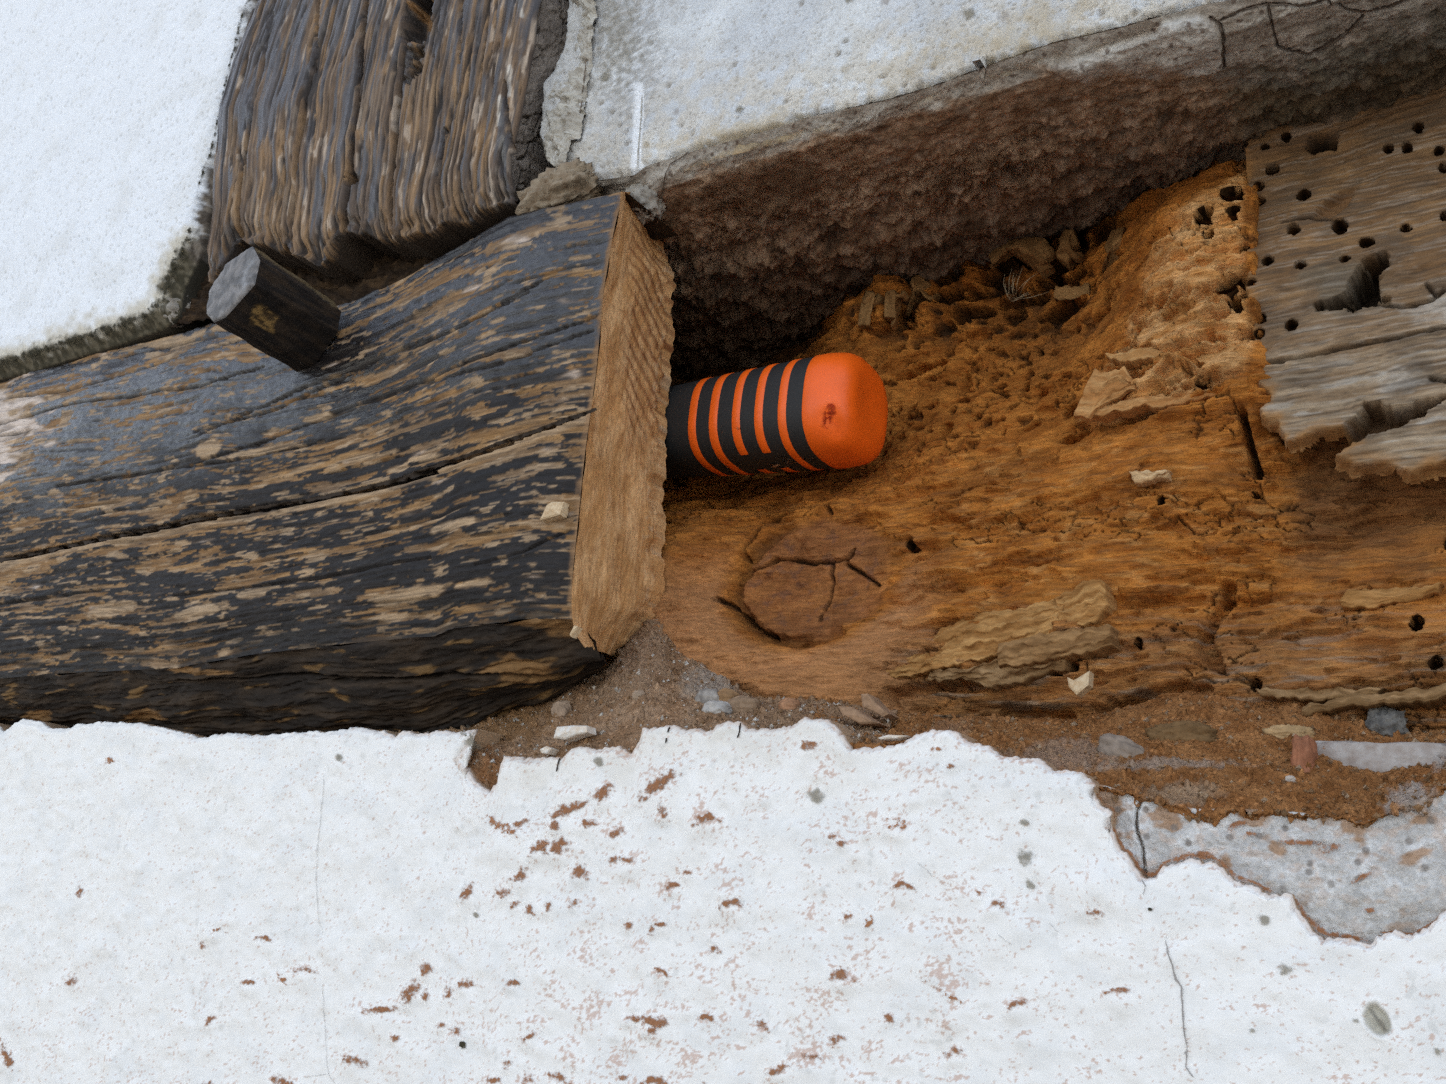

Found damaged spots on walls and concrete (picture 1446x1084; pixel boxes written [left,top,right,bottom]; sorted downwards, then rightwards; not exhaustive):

crack [1217,0,1403,65]
flaking render [540,746,559,756]
peeling [1365,706,1409,737]
spalling [1097,785,1446,944]
crack [1165,941,1193,1077]